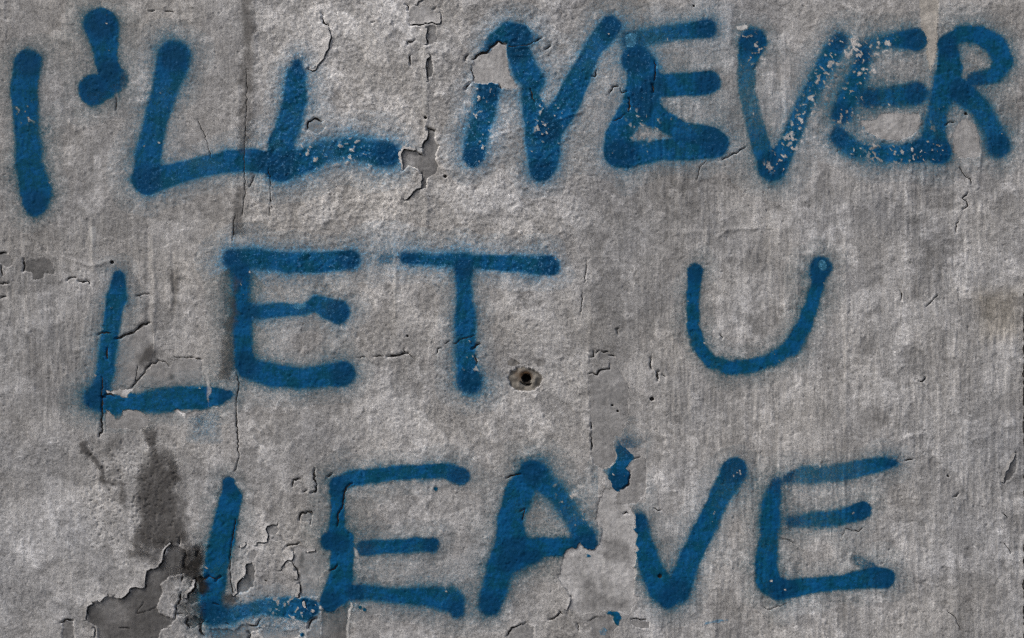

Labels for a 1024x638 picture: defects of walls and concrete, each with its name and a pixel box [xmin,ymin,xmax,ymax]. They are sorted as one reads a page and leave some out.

crack [309,14,332,72]
flaking render [407,0,441,82]
flaking render [471,41,516,89]
crack [232,69,272,238]
spalling [398,116,447,200]
crack [99,322,149,437]
water stain [135,430,208,594]
spalling [61,542,201,638]